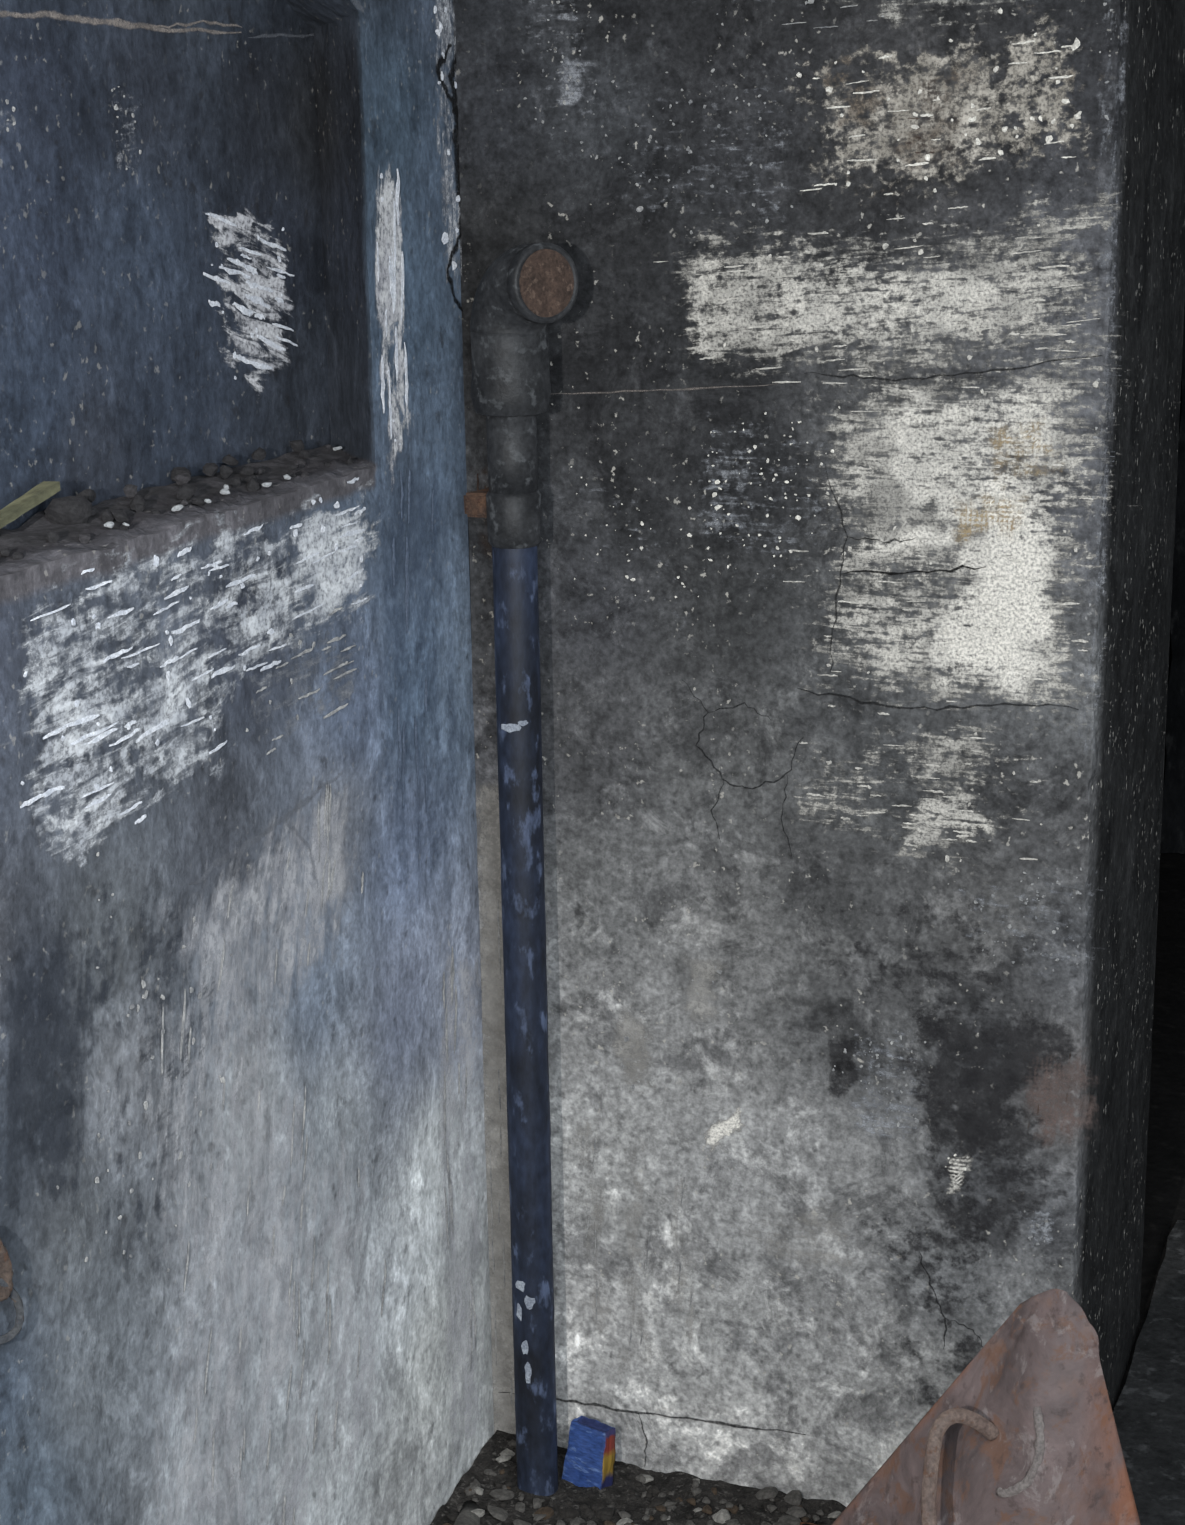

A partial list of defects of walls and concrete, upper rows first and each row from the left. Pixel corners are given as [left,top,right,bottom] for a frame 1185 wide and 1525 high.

crack [0,11,242,34]
damp [872,999,1073,1374]